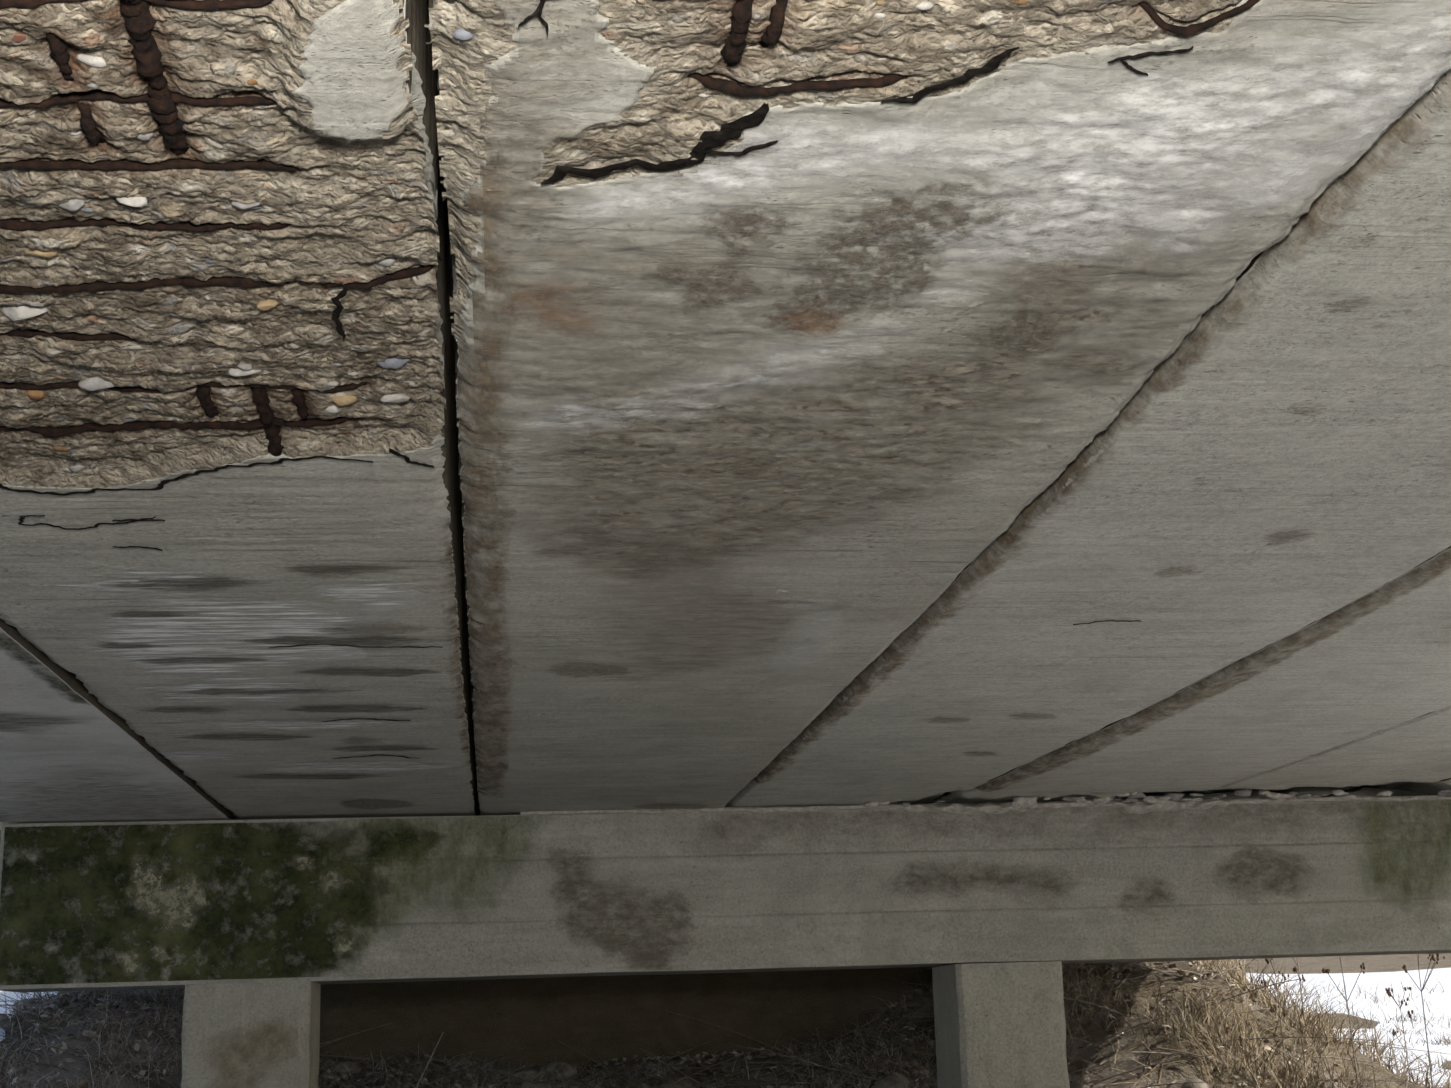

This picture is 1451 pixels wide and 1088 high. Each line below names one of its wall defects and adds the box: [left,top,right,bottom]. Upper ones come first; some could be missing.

spalling [534,0,1260,186]
efflorescence [586,20,1450,254]
spalling [0,0,518,489]
crack [331,282,350,340]
damp [98,566,439,759]
damp [239,746,431,779]
damp [559,860,688,969]